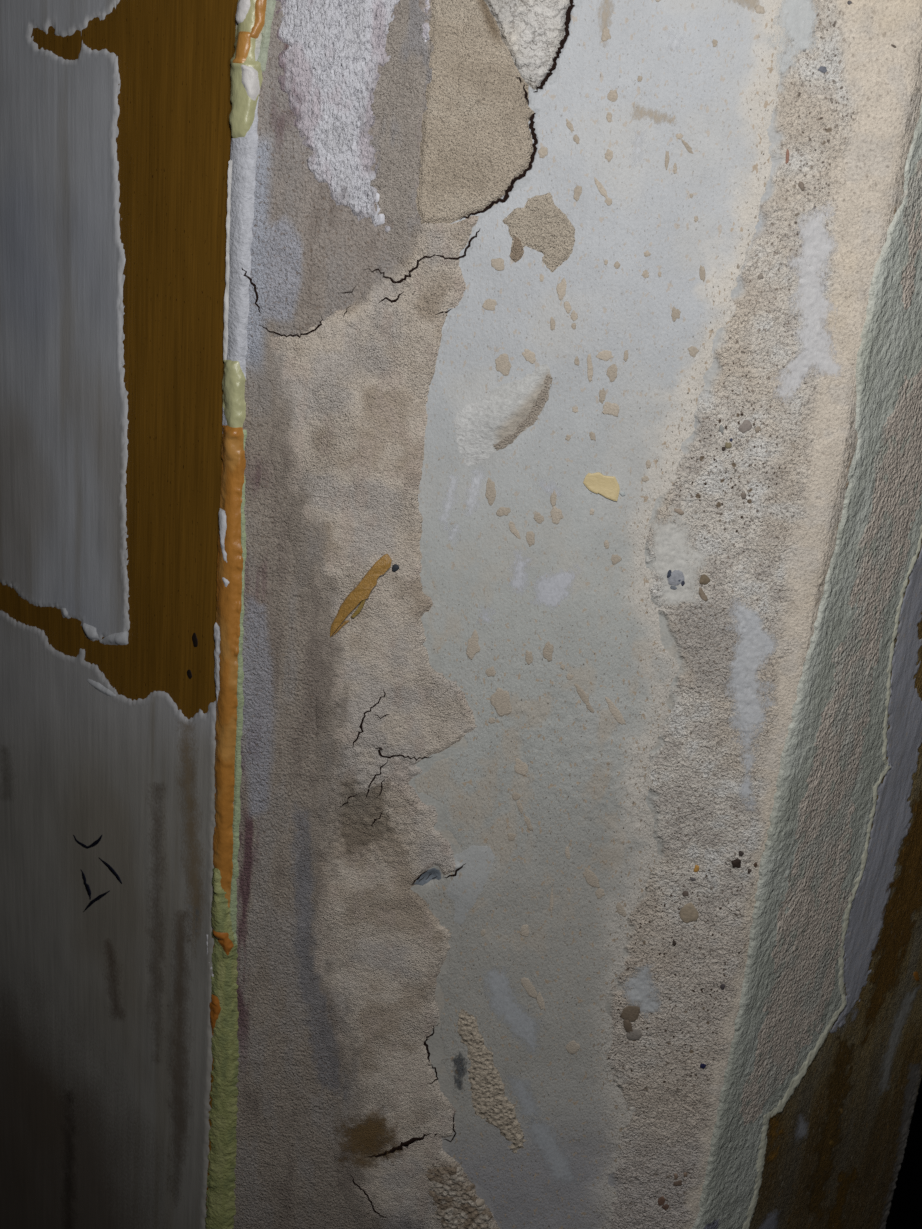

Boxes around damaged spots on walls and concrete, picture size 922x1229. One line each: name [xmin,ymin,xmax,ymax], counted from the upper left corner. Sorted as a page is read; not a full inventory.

peeling [241,65,260,100]
crack [241,0,575,338]
peeling [218,508,227,562]
crack [337,689,431,827]
spalling [276,0,789,1229]
peeling [692,103,922,1229]
corrosion [808,792,922,1229]